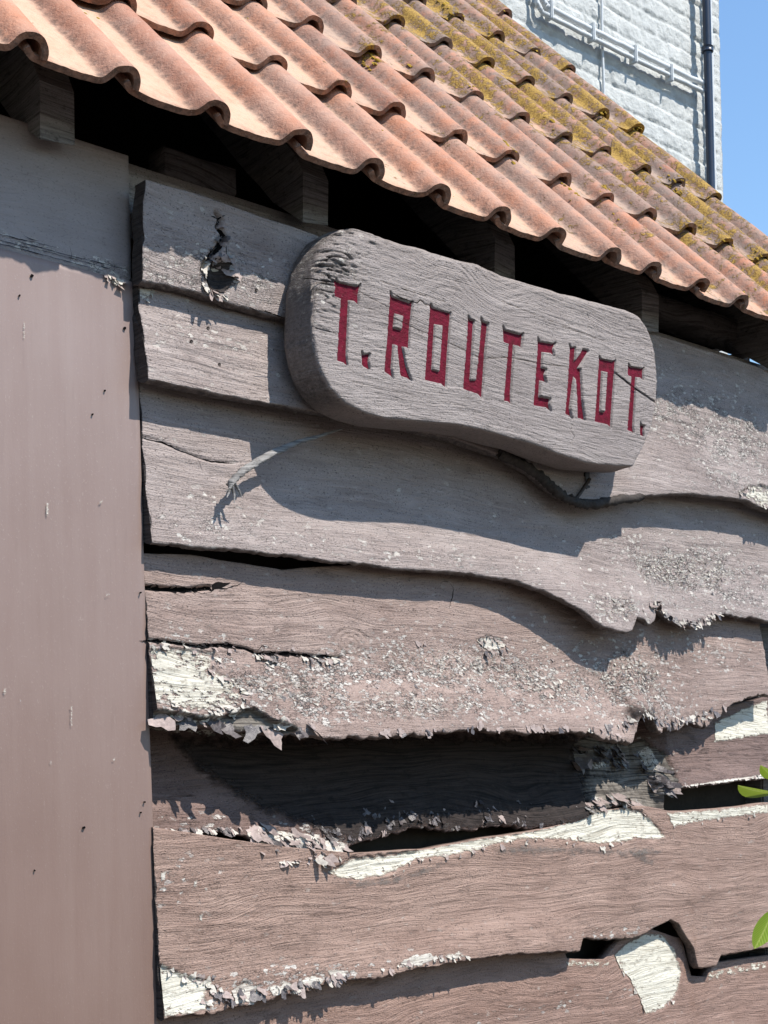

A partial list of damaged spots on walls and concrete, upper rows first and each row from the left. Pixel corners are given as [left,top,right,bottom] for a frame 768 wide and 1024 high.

crack [205,215,231,266]
crack [143,437,235,469]
peeling [148,635,768,879]
peeling [160,965,350,1018]
peeling [381,951,471,976]
peeling [566,934,681,1014]